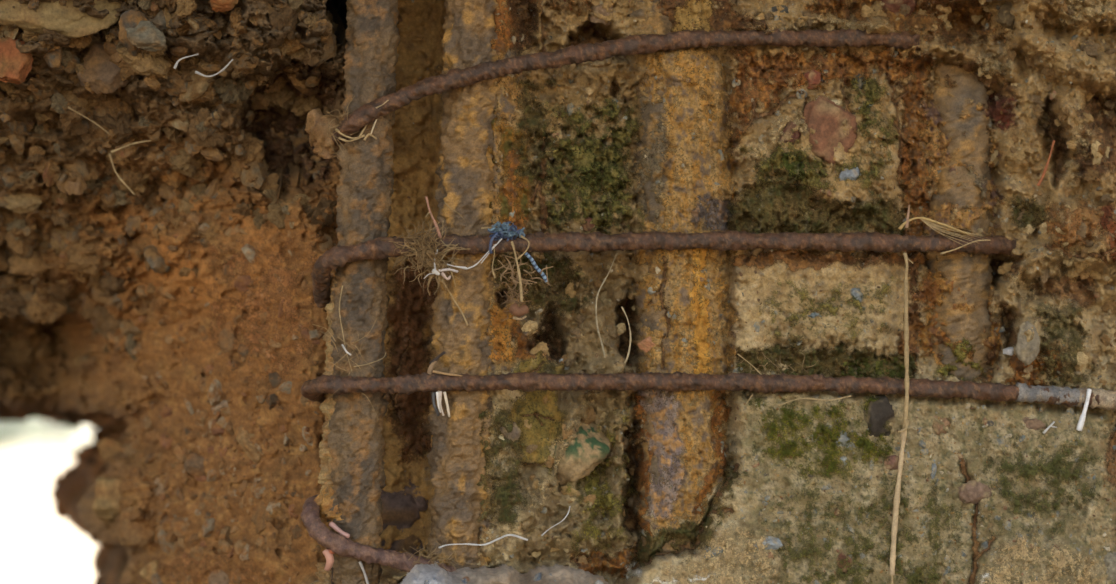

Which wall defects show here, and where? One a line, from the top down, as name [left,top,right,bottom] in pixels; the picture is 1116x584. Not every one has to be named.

corrosion [487,71,537,234]
corrosion [633,0,1017,237]
spalling [935,57,1019,105]
corrosion [485,257,540,373]
spalling [513,305,566,374]
spalling [617,297,642,366]
corrosion [622,248,1065,386]
spalling [1001,307,1019,356]
corrosion [314,394,344,530]
peeling [506,390,568,476]
spalling [622,428,642,533]
corrosion [568,389,742,578]